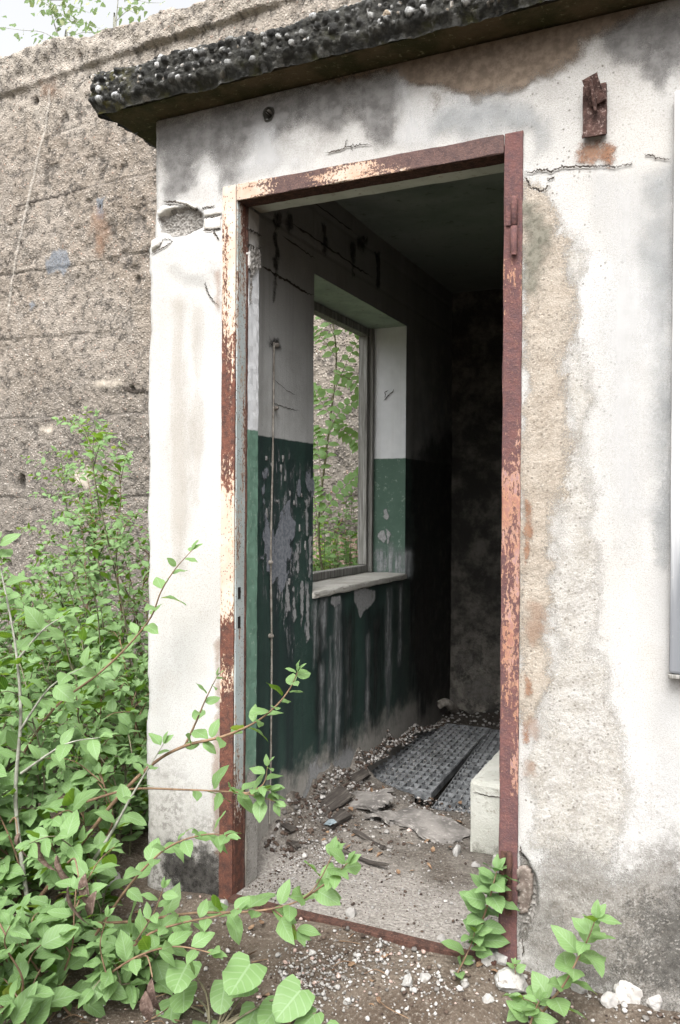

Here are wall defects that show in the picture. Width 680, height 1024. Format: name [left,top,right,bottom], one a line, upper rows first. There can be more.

damp [156,5,680,201]
crack [326,140,372,154]
corrosion [575,140,616,169]
crack [524,154,671,193]
spalling [151,200,222,252]
peeling [260,455,315,653]
flaking render [516,178,637,942]
peeling [354,588,375,619]
damp [313,435,452,764]